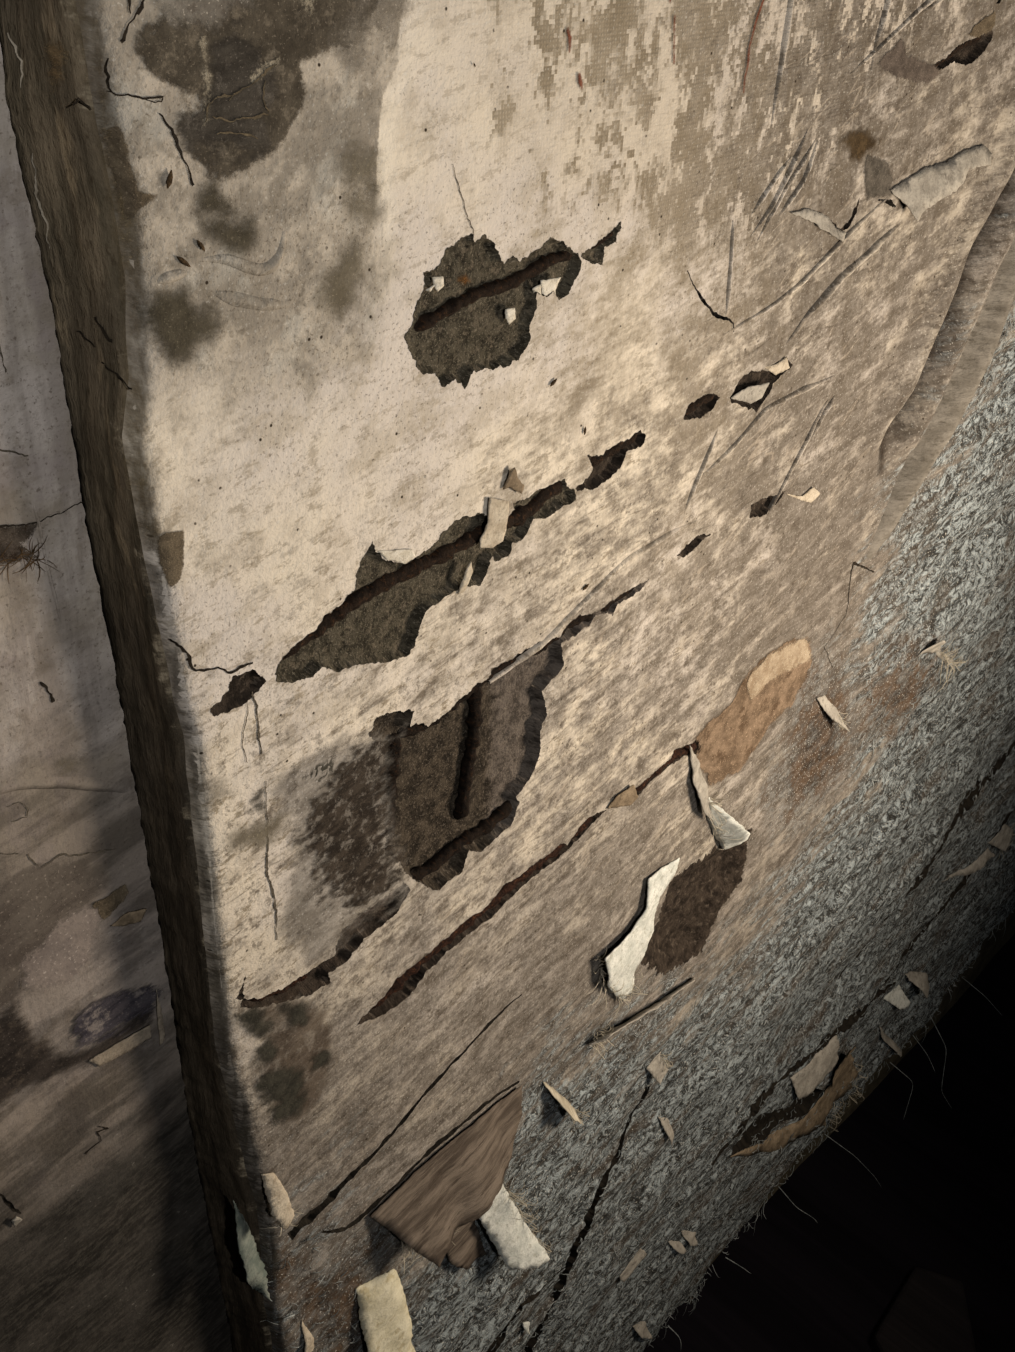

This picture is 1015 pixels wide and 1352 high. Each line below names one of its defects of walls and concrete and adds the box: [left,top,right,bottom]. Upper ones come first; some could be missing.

crack [72,0,194,186]
water stain [199,36,213,121]
water stain [199,184,257,253]
water stain [343,148,376,221]
water stain [321,244,362,316]
spalling [404,222,622,389]
spalling [684,356,793,420]
crack [0,449,28,457]
spalling [210,430,646,717]
spalling [677,534,711,558]
spalling [237,581,648,1009]
flaking render [358,638,812,1060]